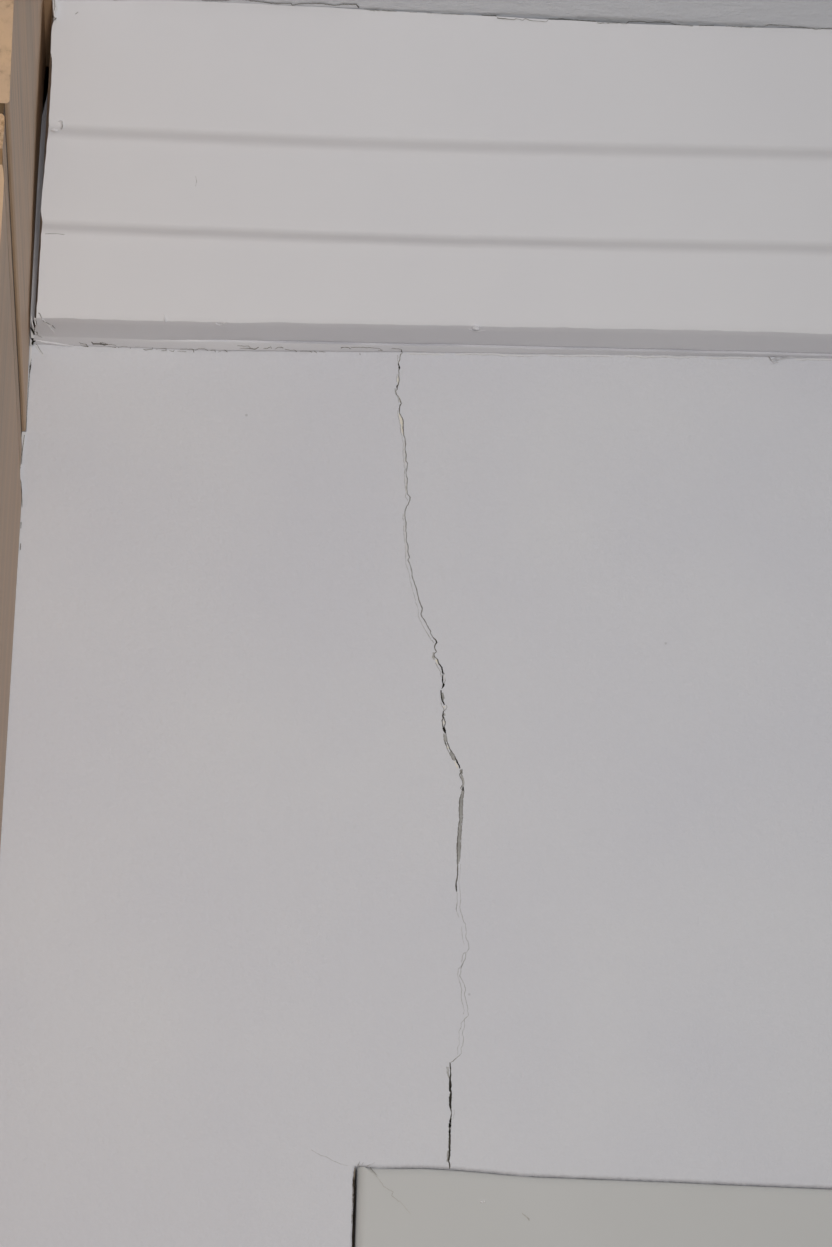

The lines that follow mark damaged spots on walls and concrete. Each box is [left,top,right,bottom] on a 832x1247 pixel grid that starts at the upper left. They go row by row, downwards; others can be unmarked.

crack [20,313,469,1169]